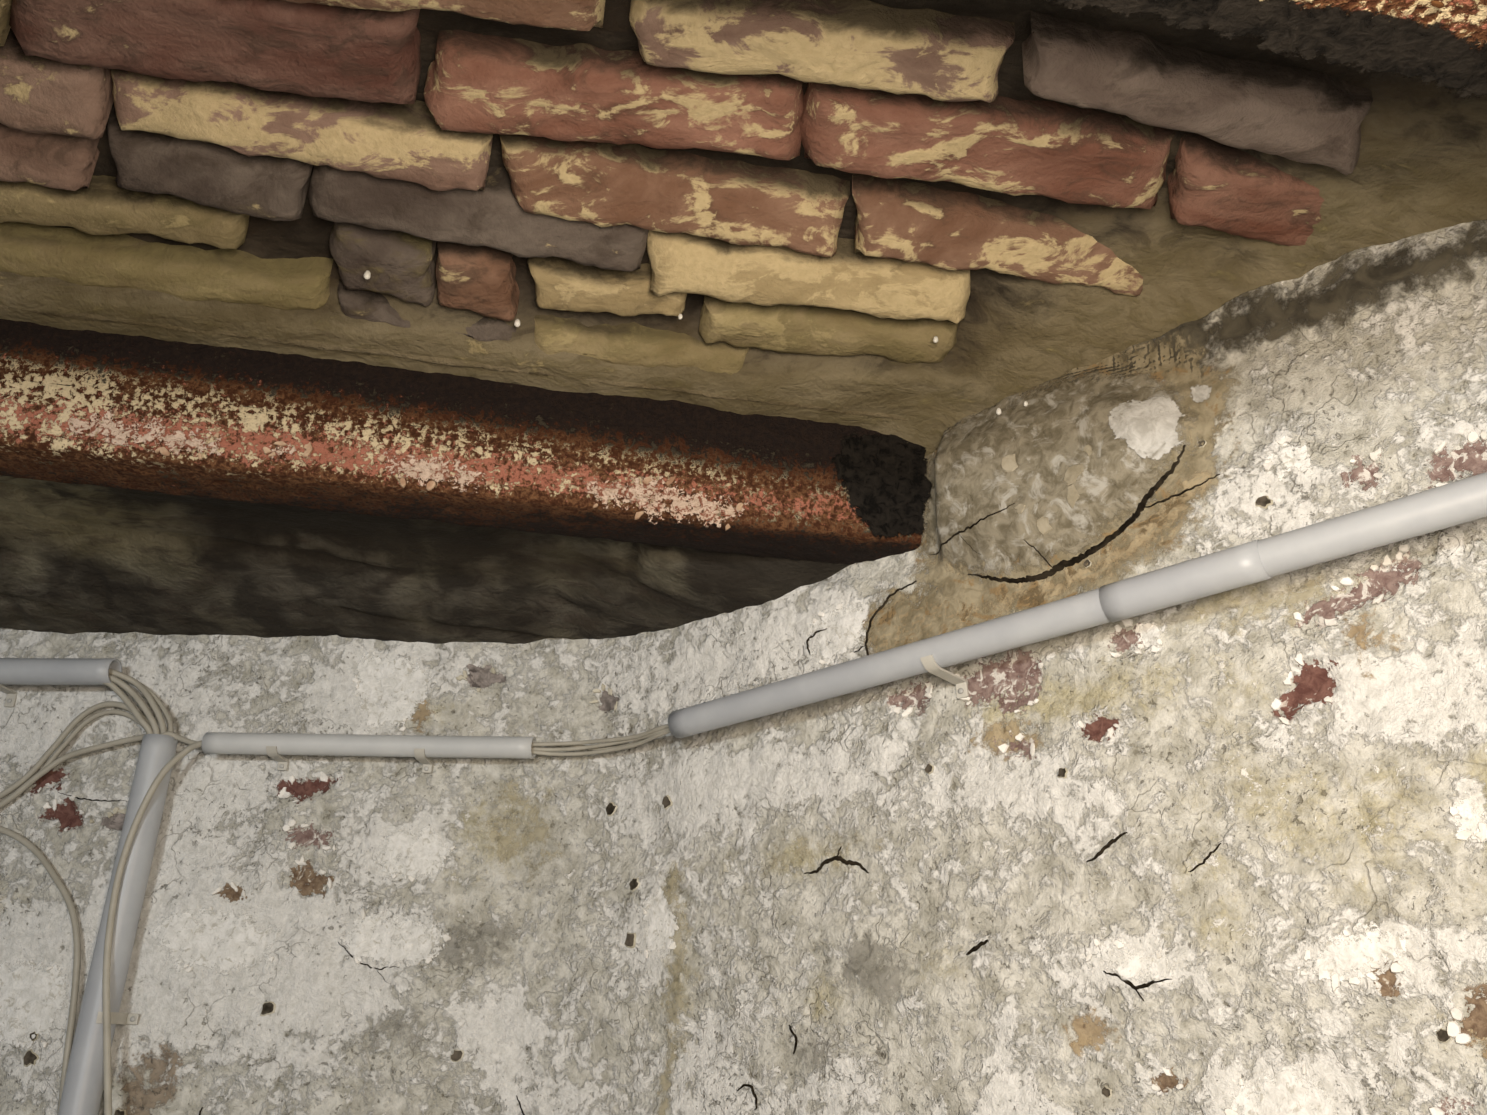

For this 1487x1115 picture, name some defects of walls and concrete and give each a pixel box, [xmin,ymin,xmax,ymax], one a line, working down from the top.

peeling [54,410,223,460]
peeling [377,450,494,493]
peeling [1262,435,1313,481]
spalling [1340,447,1383,491]
spalling [1425,431,1487,489]
peeling [584,476,749,530]
spalling [1255,496,1273,509]
crack [854,445,1220,656]
spalling [1293,544,1422,629]
crack [806,628,827,654]
peeling [809,602,869,665]
spalling [1108,619,1165,658]